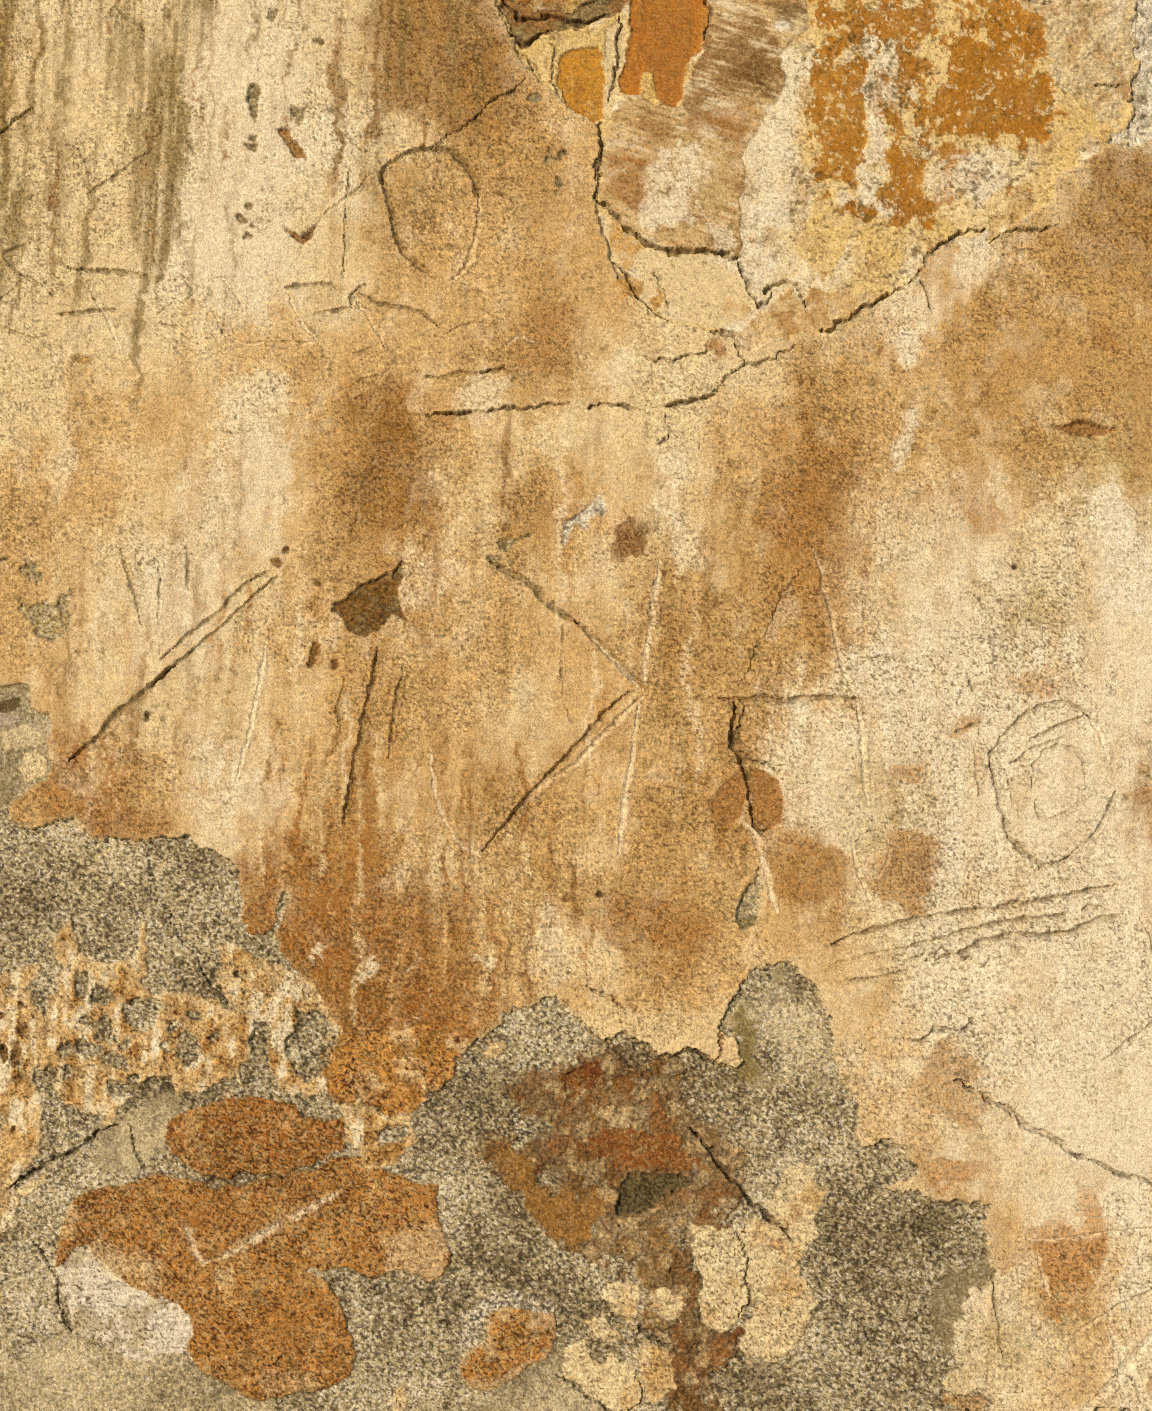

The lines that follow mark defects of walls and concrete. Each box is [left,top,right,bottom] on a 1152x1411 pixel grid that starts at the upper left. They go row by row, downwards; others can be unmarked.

water stain [0,0,48,139]
water stain [49,116,75,248]
water stain [127,0,218,275]
crack [431,0,1062,368]
spalling [496,0,1152,351]
crack [427,394,718,447]
spalling [331,561,408,637]
spalling [0,684,997,1411]
crack [953,1078,1152,1187]